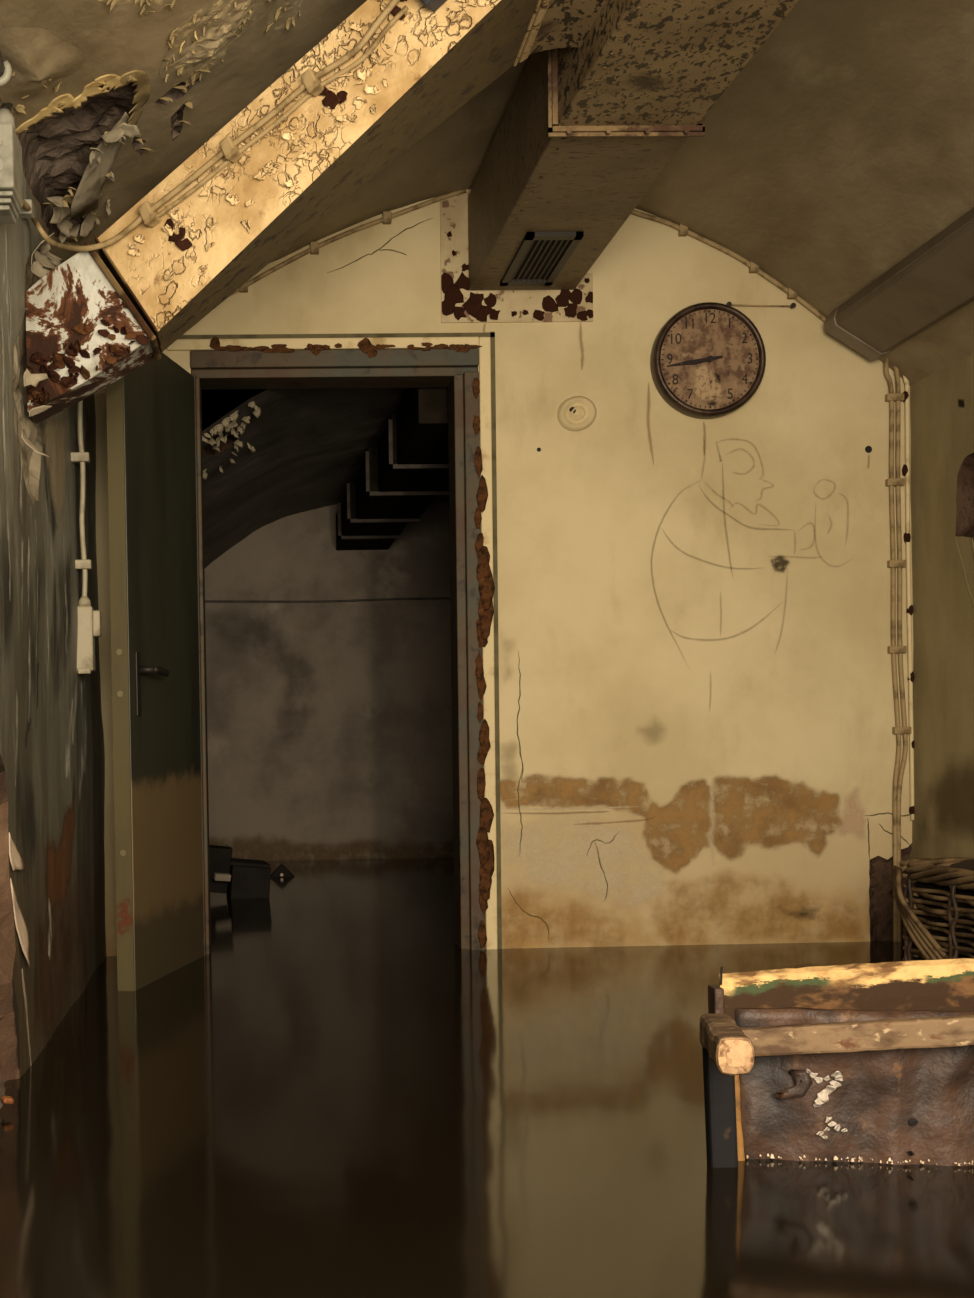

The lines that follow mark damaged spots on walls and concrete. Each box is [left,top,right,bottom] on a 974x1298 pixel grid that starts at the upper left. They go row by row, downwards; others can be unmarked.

peeling [12,0,303,505]
rust [441,231,593,322]
rust [26,319,149,405]
rust [210,336,342,356]
rust [358,338,482,358]
damp [40,417,66,540]
flaking render [955,452,974,608]
damp [0,551,71,683]
rust [473,415,495,949]
crack [587,831,620,901]
crack [509,890,549,938]